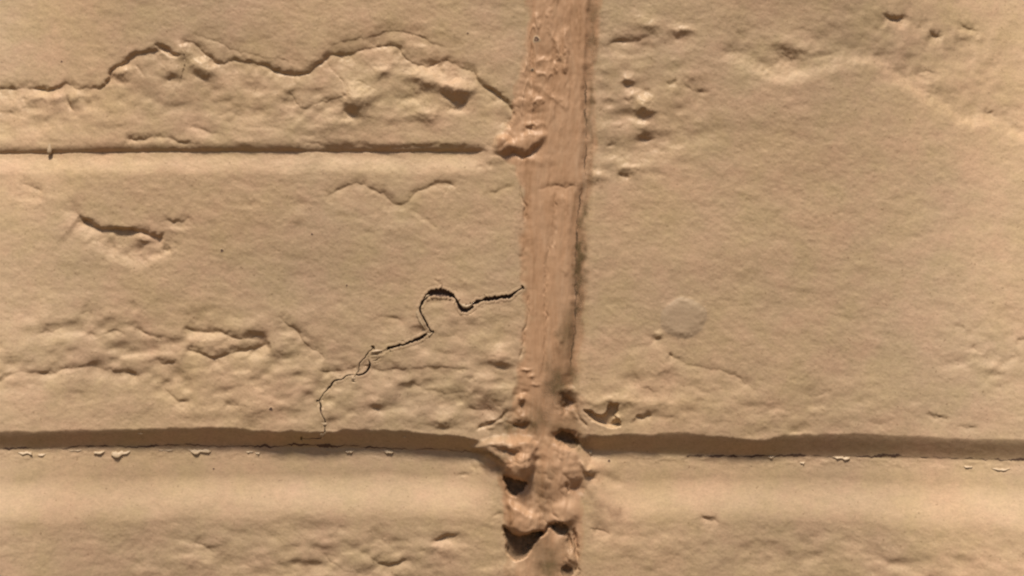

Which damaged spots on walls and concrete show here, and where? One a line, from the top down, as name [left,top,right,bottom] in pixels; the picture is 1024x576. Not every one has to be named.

peeling [0,21,517,157]
crack [3,284,524,452]
peeling [476,364,542,435]
spalling [562,399,620,428]
spalling [555,431,593,455]
hole [504,476,527,496]
hole [504,521,569,561]
spalling [560,553,574,576]